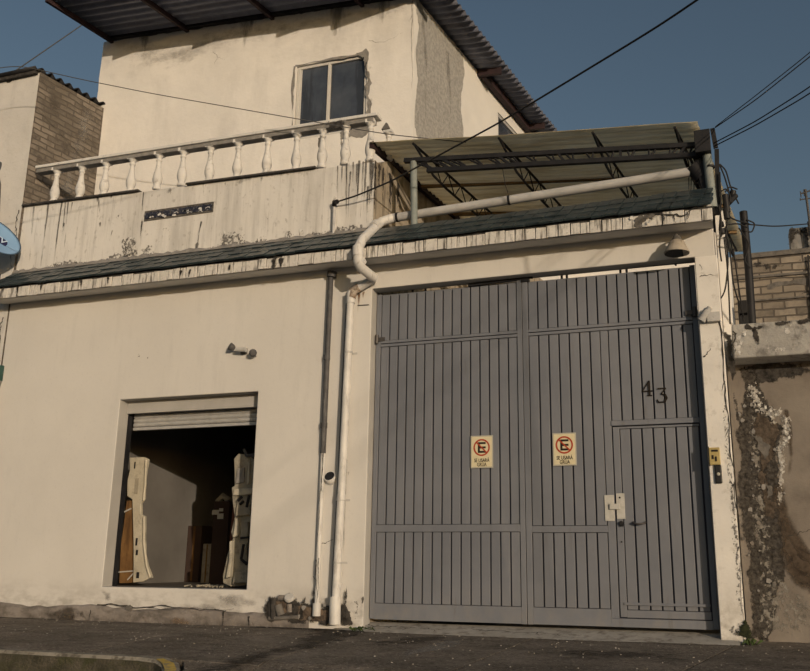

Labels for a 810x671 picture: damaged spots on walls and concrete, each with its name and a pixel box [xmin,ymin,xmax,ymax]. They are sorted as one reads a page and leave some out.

spalling [291,49,373,125]
peeling [328,120,368,147]
damp [337,158,400,209]
peeling [109,237,152,259]
peeling [222,231,267,245]
peeling [723,405,743,611]
spalling [751,413,780,519]
damp [723,332,810,641]
spalling [298,603,329,621]
peeling [758,577,810,638]